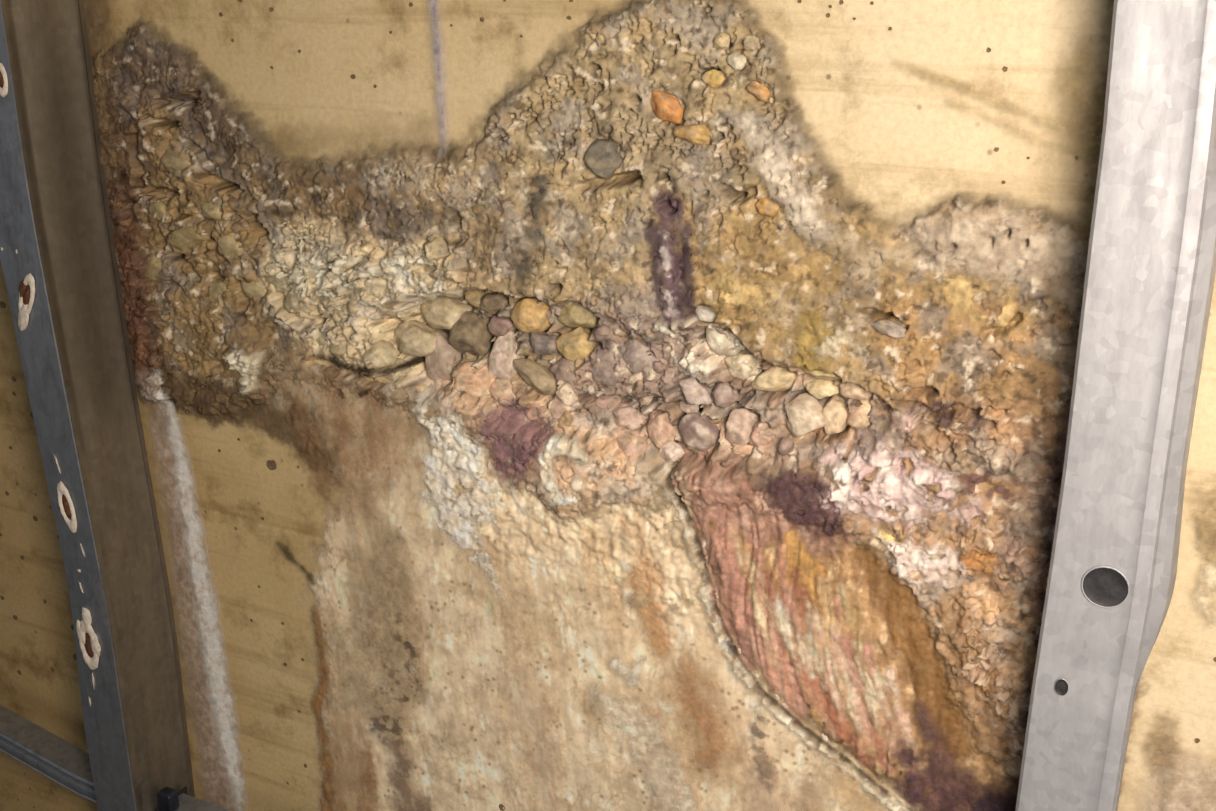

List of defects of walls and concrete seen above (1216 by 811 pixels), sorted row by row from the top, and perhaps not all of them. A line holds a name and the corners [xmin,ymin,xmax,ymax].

water stain [1030,50,1104,172]
water stain [273,233,447,312]
water stain [366,158,429,190]
water stain [526,177,548,237]
water stain [599,286,646,314]
water stain [649,114,1087,376]
water stain [134,350,1072,811]
rust [644,449,1018,801]